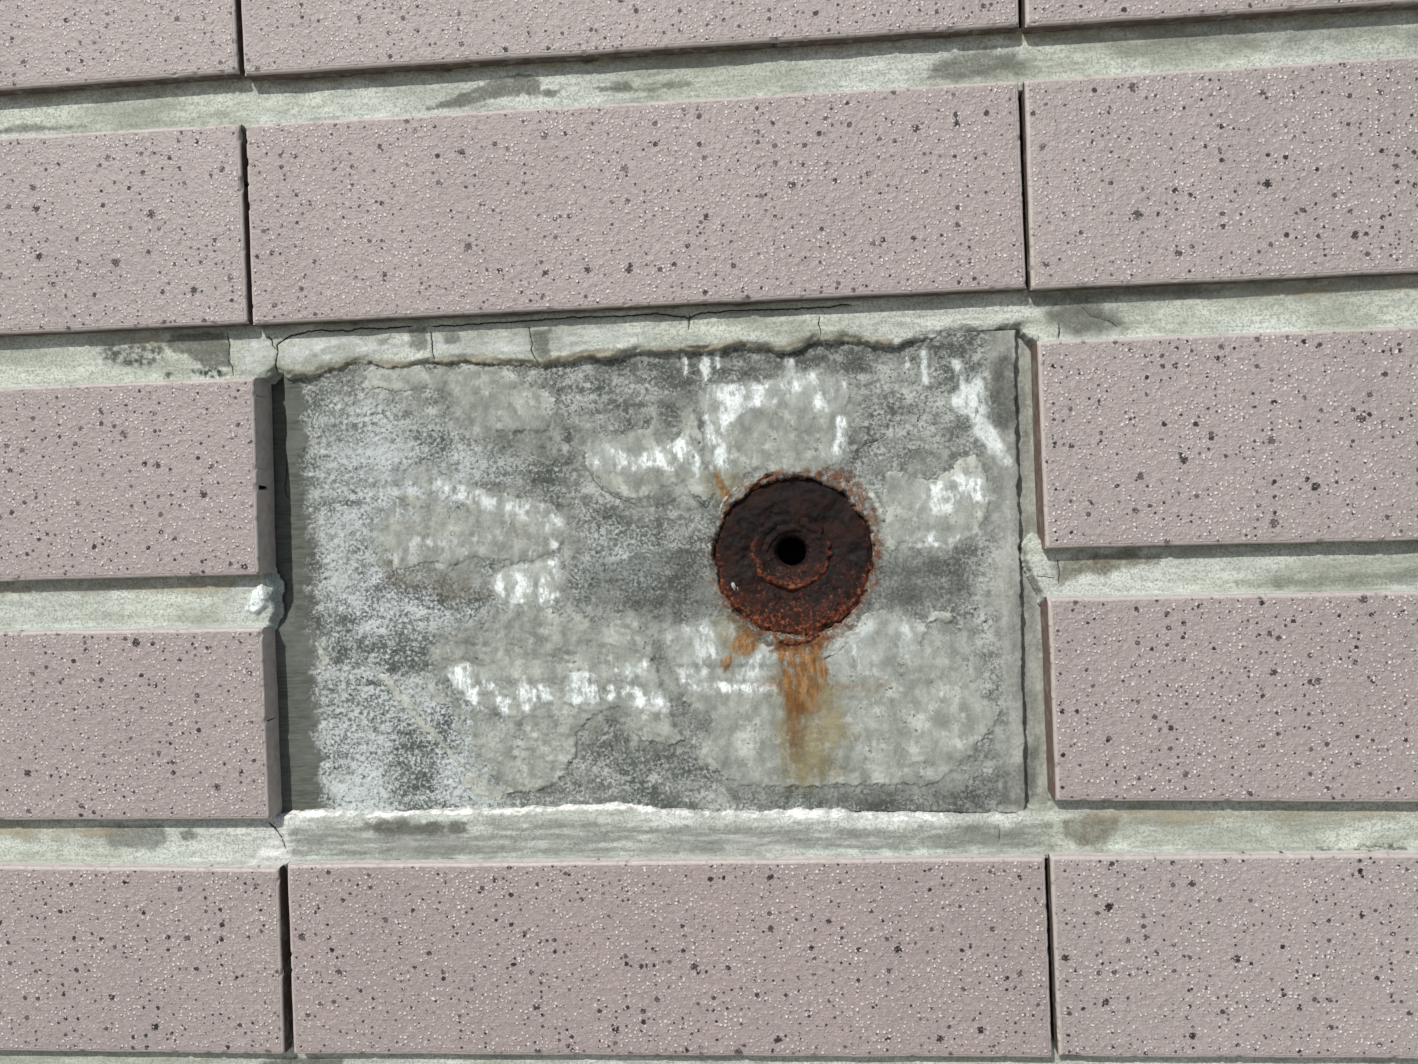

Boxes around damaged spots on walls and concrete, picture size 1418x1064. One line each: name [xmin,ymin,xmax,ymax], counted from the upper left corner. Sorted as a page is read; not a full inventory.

peeling [362,363,851,516]
peeling [868,394,1009,550]
peeling [315,642,332,666]
peeling [374,478,1002,801]
rust [710,469,881,781]